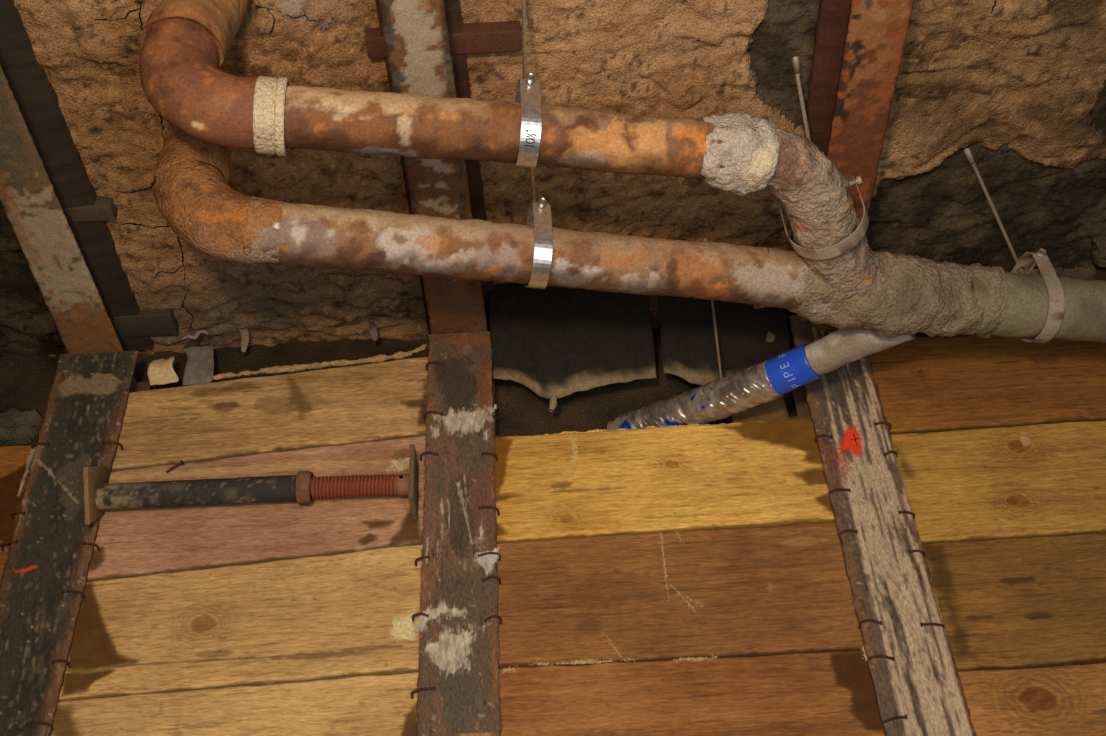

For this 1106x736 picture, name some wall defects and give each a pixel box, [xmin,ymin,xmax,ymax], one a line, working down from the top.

crack [91,0,143,31]
spalling [747,0,820,131]
spalling [1090,80,1106,136]
spalling [865,141,1106,273]
crack [120,223,193,331]